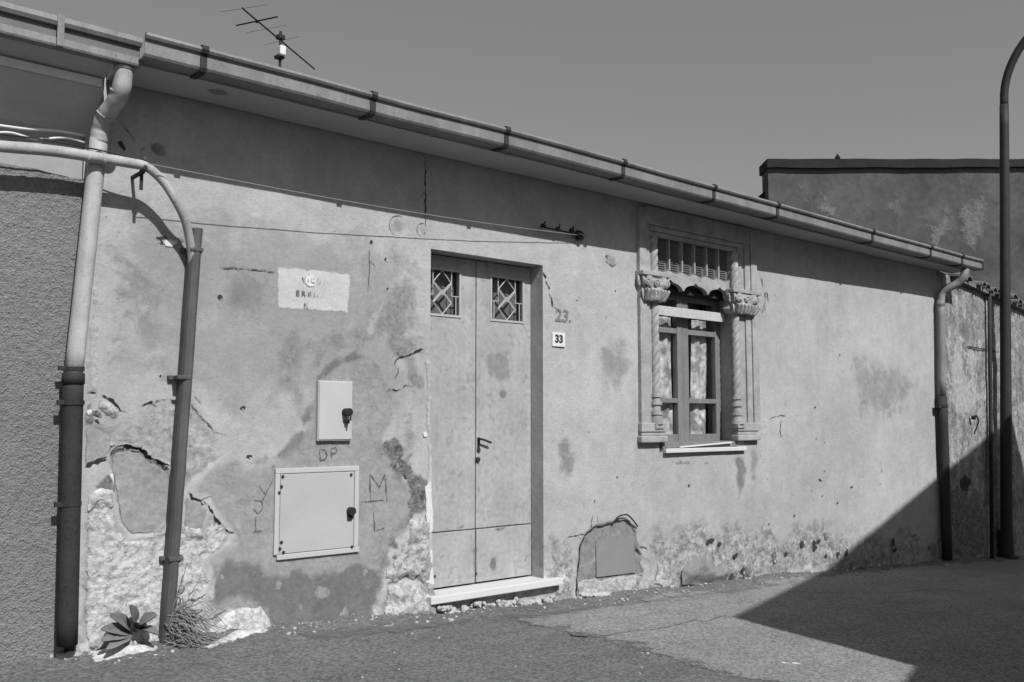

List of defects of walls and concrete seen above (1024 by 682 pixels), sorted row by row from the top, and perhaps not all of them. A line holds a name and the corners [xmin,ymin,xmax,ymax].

crack [421,156,432,222]
crack [88,392,166,411]
crack [85,444,170,466]
flaking render [114,400,176,459]
flaking render [185,410,216,481]
crack [386,348,424,393]
flaking render [380,361,434,585]
flaking render [83,473,165,649]
flaking render [176,523,228,607]
crack [188,491,234,533]
flaking render [639,475,985,587]
flaking render [208,607,270,632]